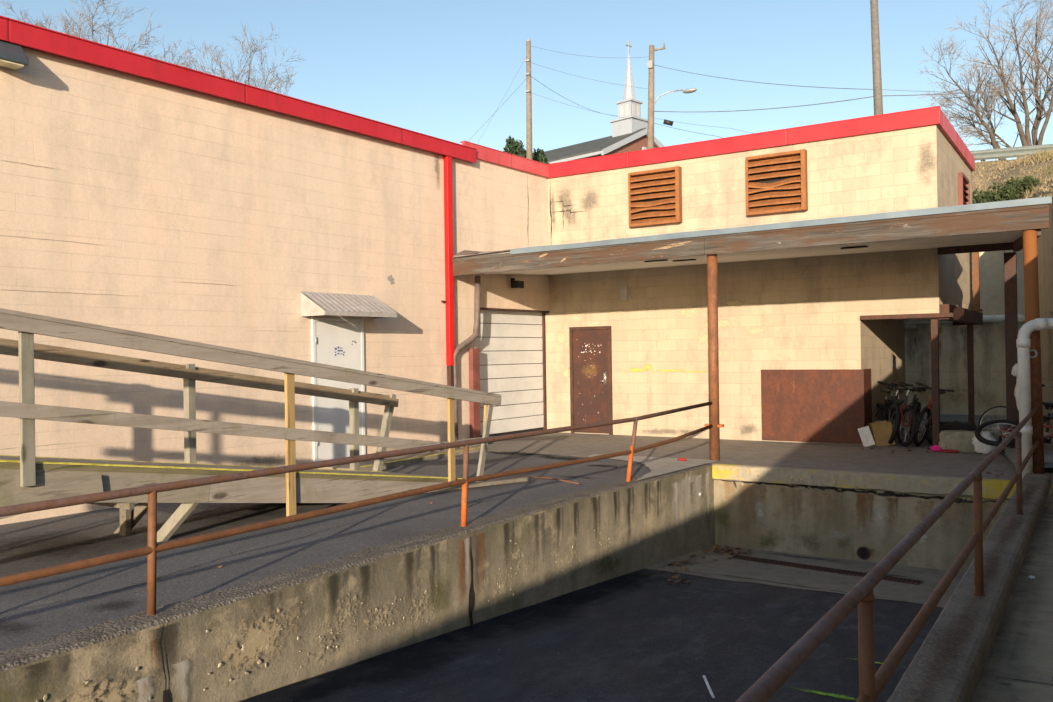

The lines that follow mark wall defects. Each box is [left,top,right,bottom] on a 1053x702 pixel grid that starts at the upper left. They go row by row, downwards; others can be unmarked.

leakage [535,502,578,537]
leakage [614,481,661,524]
leakage [675,473,710,511]
leakage [329,572,345,613]
crack [460,535,482,625]
spalling [208,581,442,681]